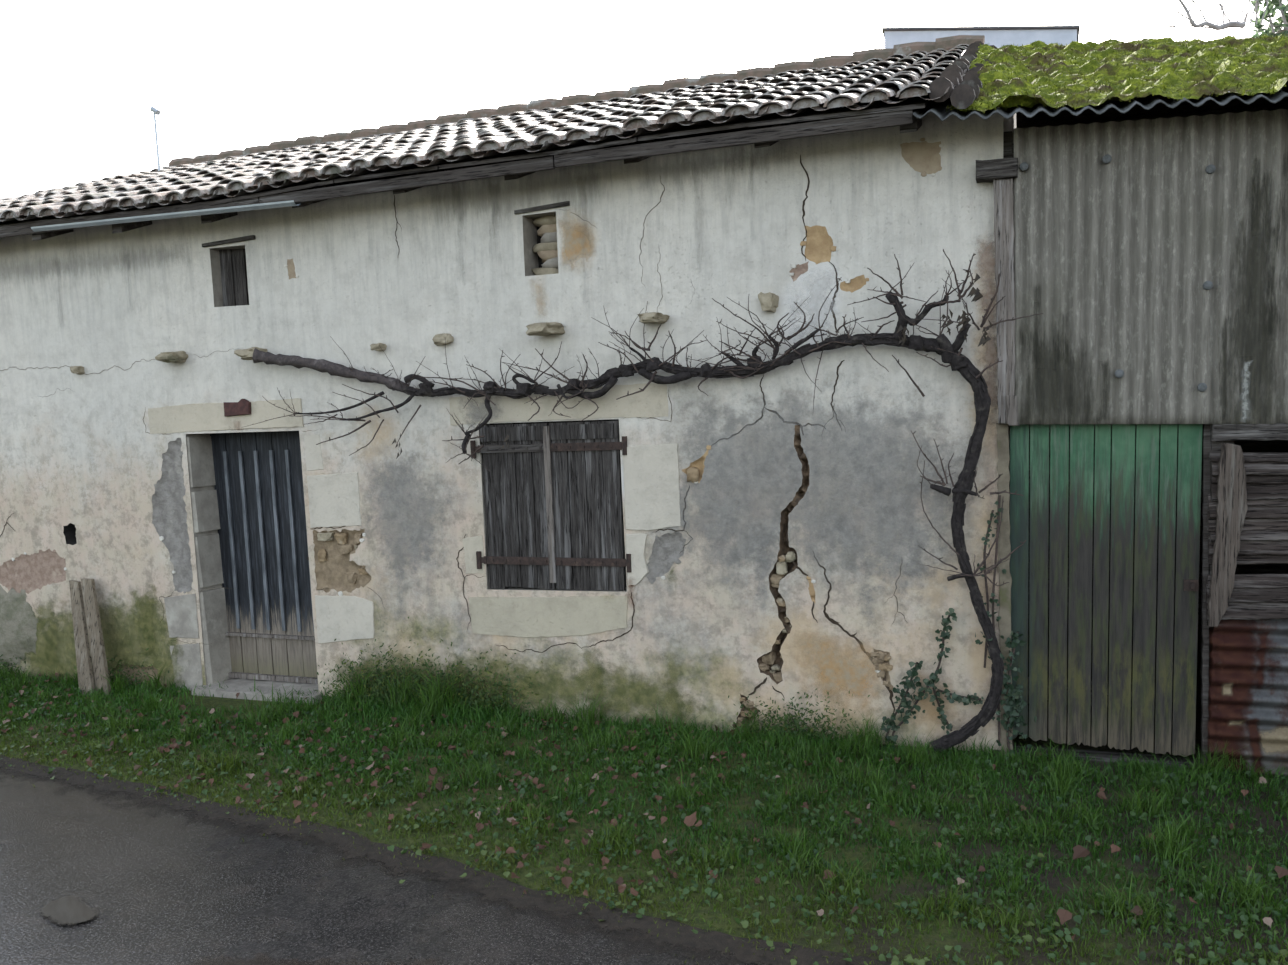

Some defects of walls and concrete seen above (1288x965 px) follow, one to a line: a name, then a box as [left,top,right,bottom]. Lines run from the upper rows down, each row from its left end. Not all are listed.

flaking render [900,138,944,177]
flaking render [789,225,837,282]
leakage [1221,176,1277,423]
flaking render [152,438,193,593]
flaking render [0,523,77,594]
flaking render [313,528,371,596]
flaking render [645,532,686,584]
crack [888,562,908,624]
crack [792,552,895,713]
rust [1208,626,1268,776]